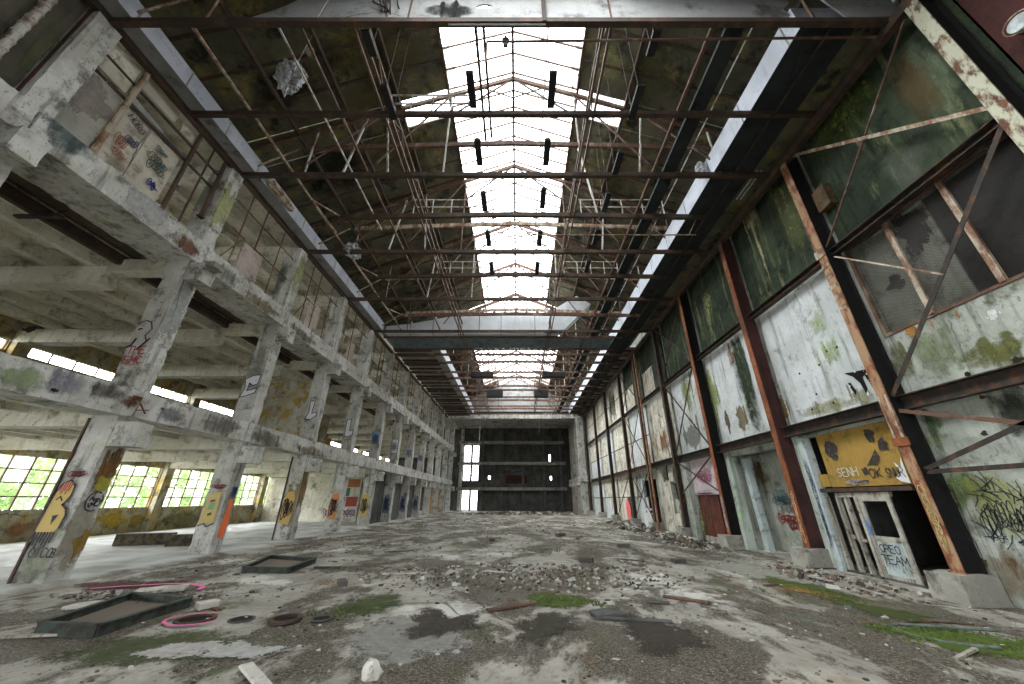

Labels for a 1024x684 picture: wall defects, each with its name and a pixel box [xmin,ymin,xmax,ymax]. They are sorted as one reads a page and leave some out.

damp [743,209,765,264]
damp [772,179,805,246]
damp [891,328,953,375]
damp [976,331,1020,359]
damp [731,337,760,432]